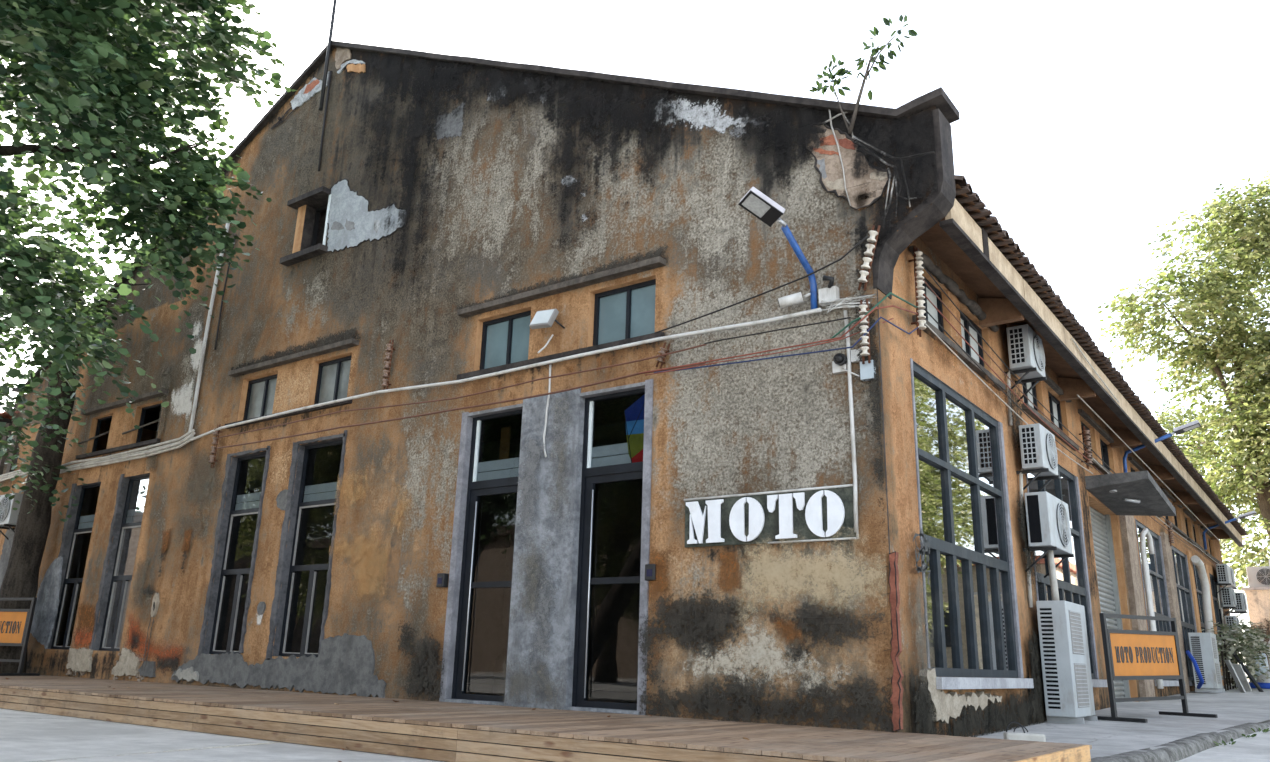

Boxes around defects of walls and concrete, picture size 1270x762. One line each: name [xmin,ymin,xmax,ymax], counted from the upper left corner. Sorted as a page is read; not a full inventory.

peeling [276,48,366,127]
peeling [655,96,769,138]
water stain [356,52,679,289]
spalling [807,123,889,210]
spalling [326,178,405,253]
rust [127,614,183,674]
water stain [396,623,445,701]
water stain [638,583,893,732]
flaking render [881,551,904,732]
peeling [919,668,1002,723]